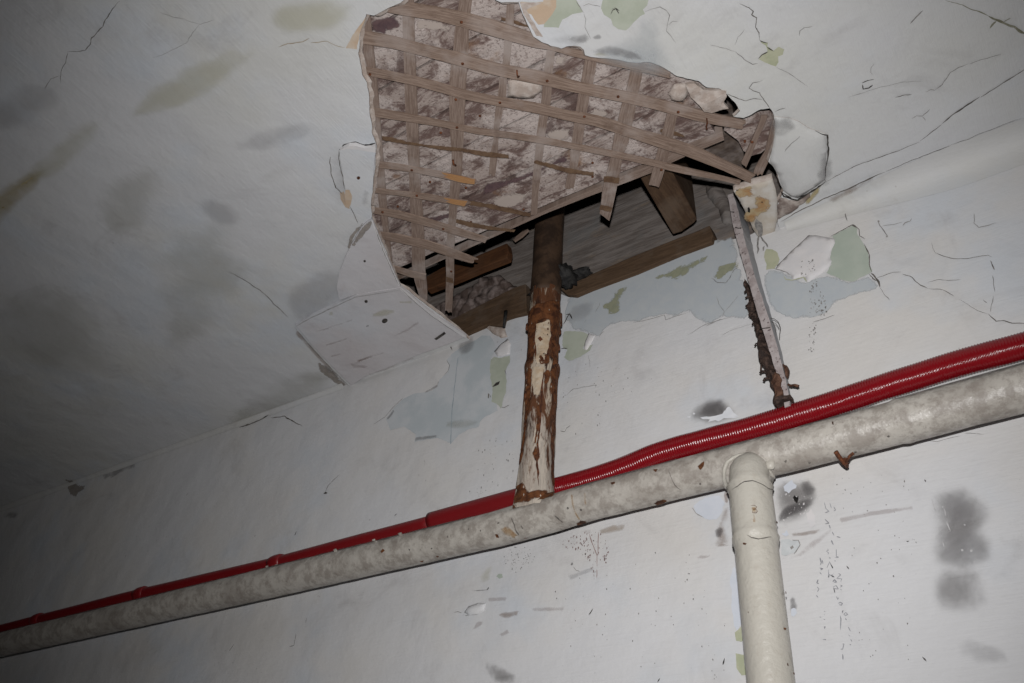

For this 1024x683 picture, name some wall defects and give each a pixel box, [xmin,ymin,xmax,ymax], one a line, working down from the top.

crack [45,5,116,88]
flaking render [496,0,626,62]
peeling [601,0,648,30]
crack [712,4,807,112]
peeling [758,41,784,66]
crack [945,0,1024,34]
crack [781,54,1024,238]
peeling [346,0,511,444]
peeling [561,238,748,361]
peeling [764,225,877,322]
crack [869,243,1024,324]
corrosion [513,300,561,509]